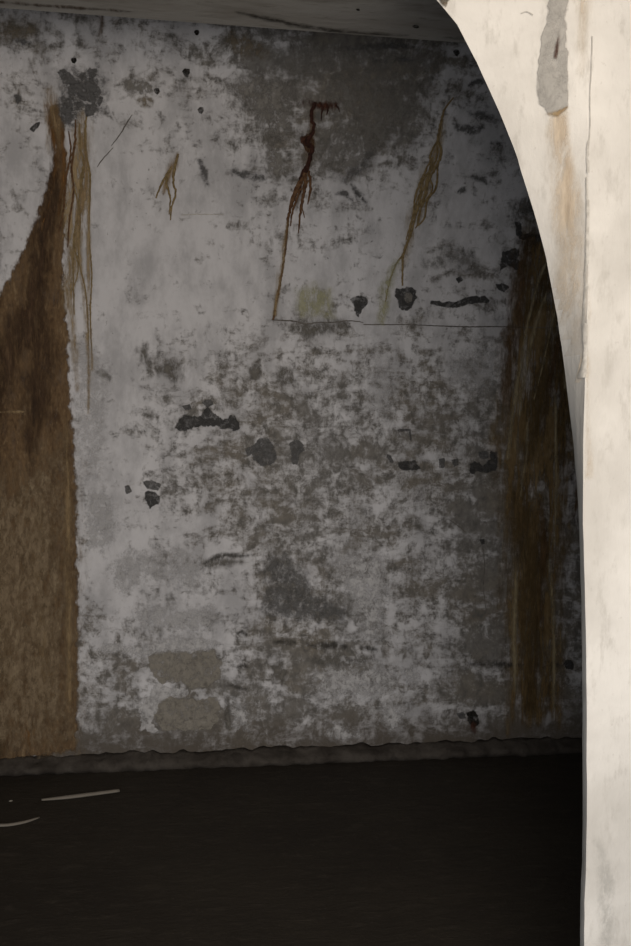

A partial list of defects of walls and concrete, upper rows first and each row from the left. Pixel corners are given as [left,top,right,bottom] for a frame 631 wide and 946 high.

spalling [57,58,160,127]
spalling [537,0,568,116]
rust [272,101,340,320]
leakage [514,199,534,214]
leakage [141,346,178,382]
spalling [175,399,240,431]